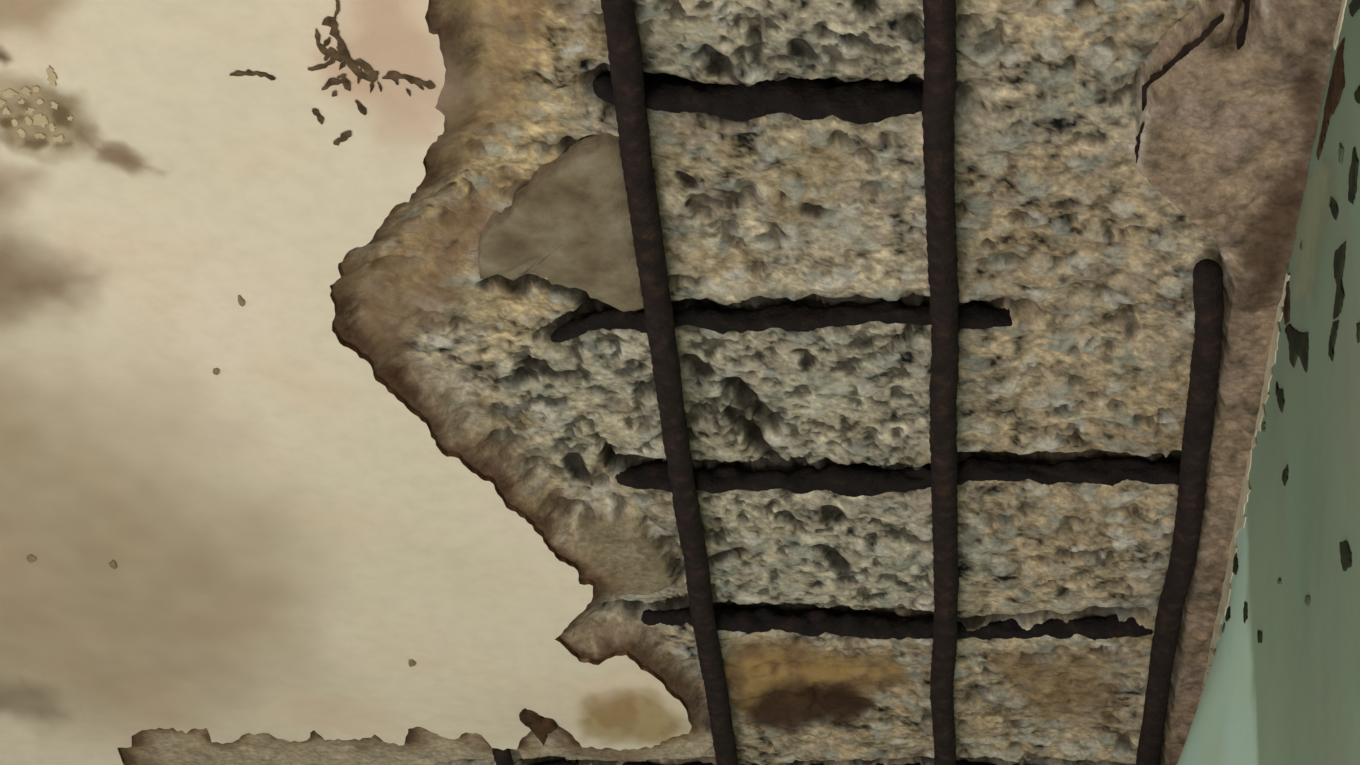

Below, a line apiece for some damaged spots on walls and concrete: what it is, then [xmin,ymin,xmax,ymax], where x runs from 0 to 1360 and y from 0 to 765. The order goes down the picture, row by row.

spalling [632,0,925,88]
crack [1135,0,1250,163]
spalling [646,108,932,472]
spalling [954,0,1235,492]
spalling [331,0,716,765]
spalling [120,727,496,765]
corrosion [585,696,677,742]
corrosion [724,643,903,731]
spalling [697,487,935,618]
spalling [717,629,934,765]
spalling [953,479,1178,765]
peeling [1198,273,1309,704]